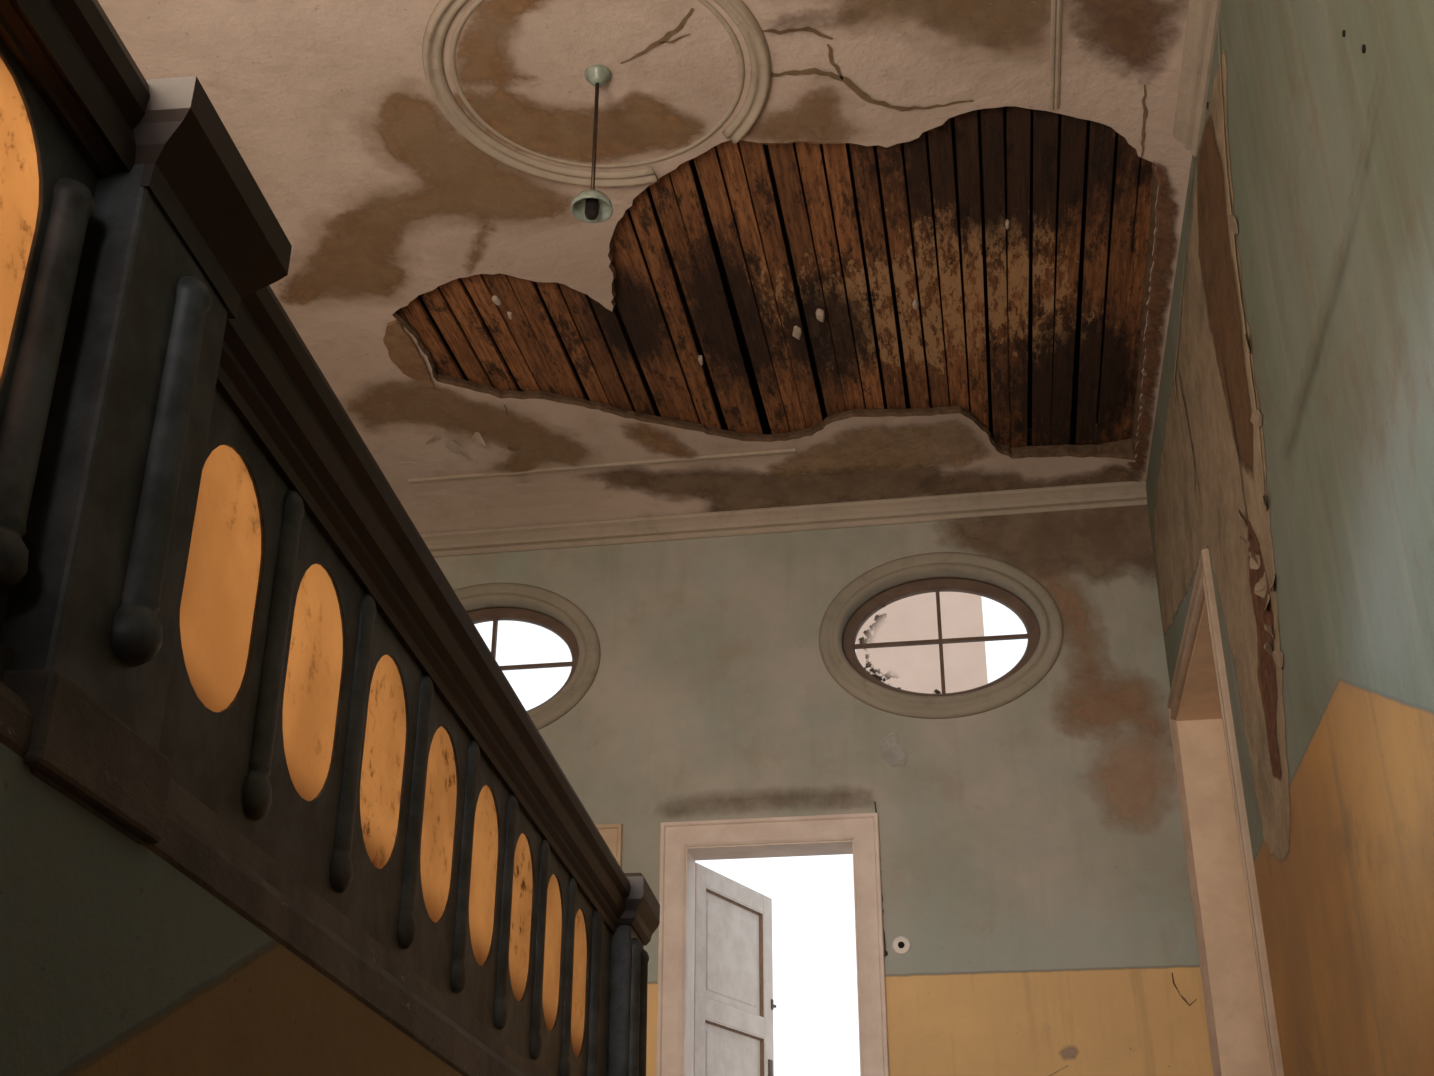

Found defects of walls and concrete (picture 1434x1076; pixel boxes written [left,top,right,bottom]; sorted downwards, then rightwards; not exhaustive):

leakage [454,0,703,162]
crack [620,8,694,64]
leakage [747,93,844,144]
crack [762,27,974,111]
leakage [838,0,1044,47]
leakage [1078,0,1177,68]
leakage [282,94,567,305]
spalling [392,106,1158,477]
leakage [605,164,1177,512]
leakage [351,383,584,472]
peeling [1154,33,1290,861]
crack [1172,973,1197,1006]